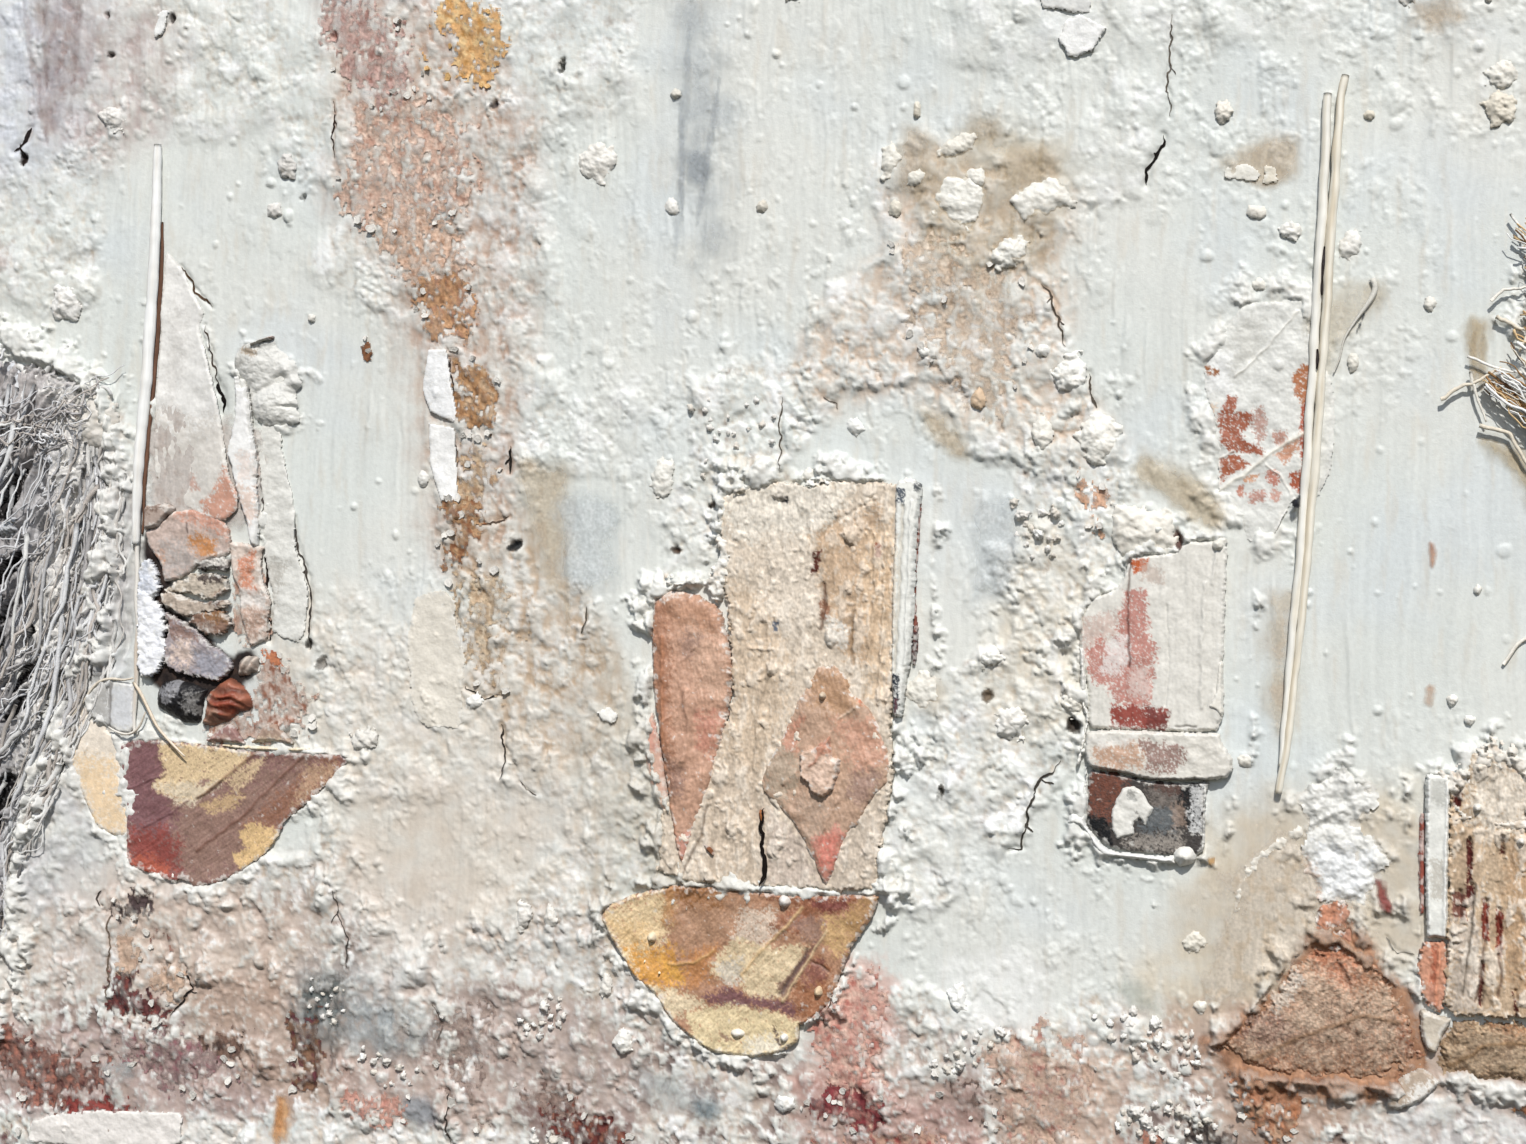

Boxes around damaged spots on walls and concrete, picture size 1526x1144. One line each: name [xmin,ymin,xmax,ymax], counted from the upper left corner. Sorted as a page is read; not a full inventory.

crack [1145,18,1176,185]